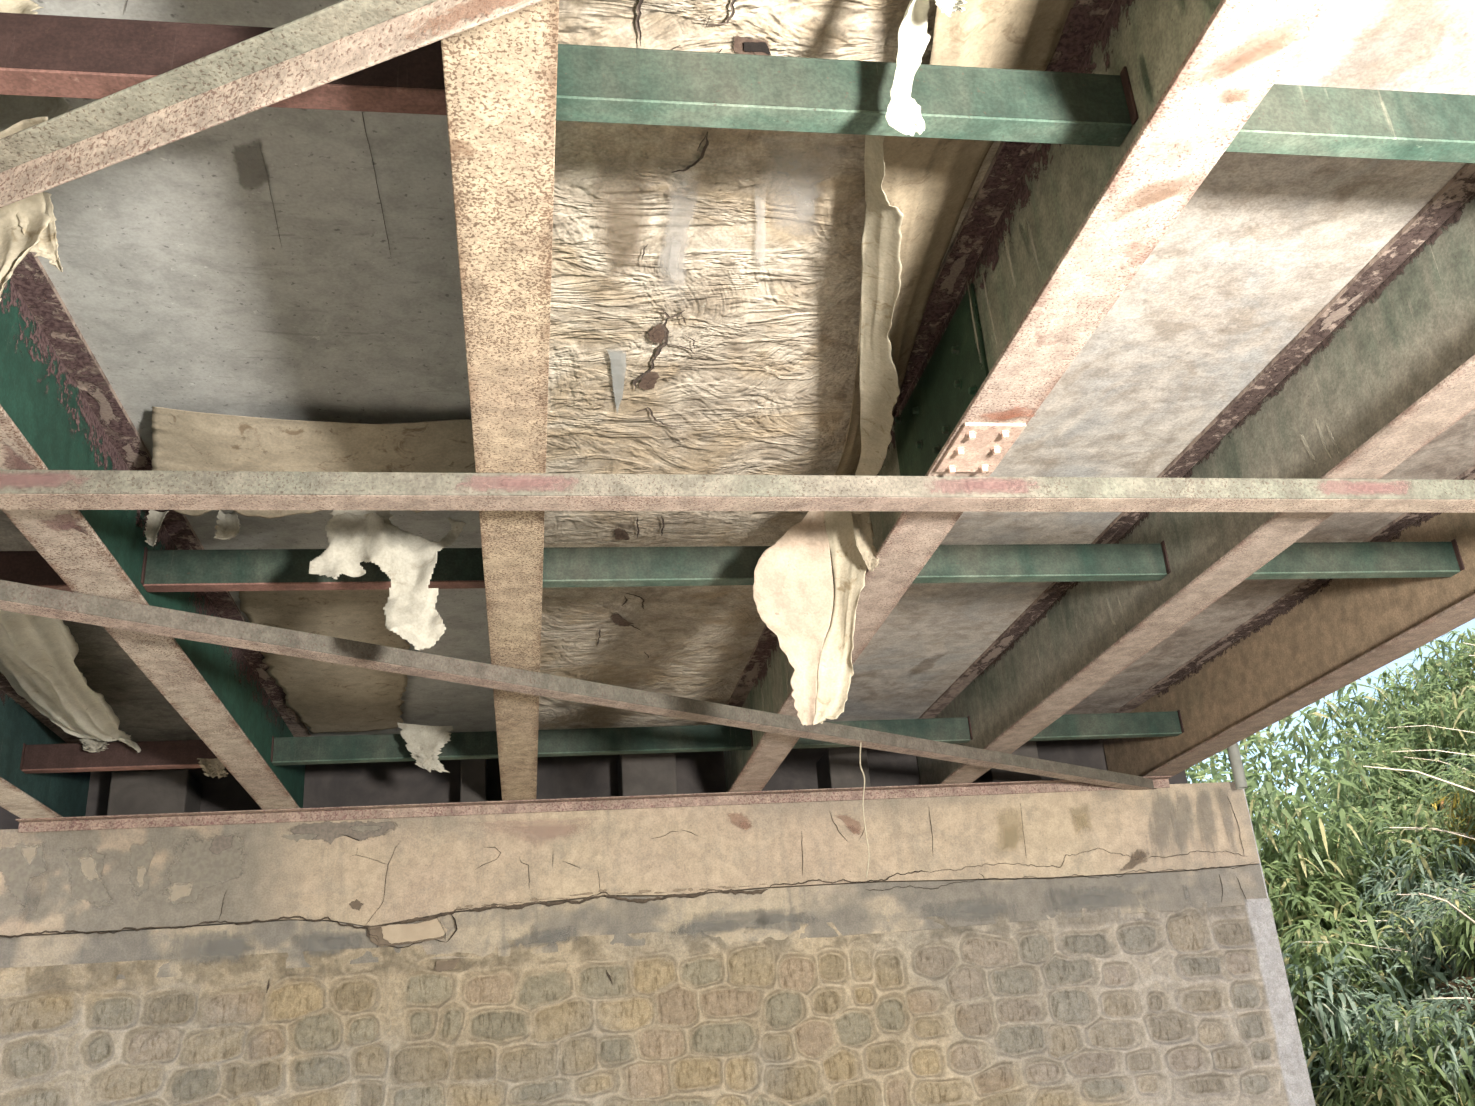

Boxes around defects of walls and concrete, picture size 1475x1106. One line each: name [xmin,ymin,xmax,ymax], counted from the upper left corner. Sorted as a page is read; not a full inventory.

crack [636,0,736,53]
crack [671,132,709,173]
corrosion [877,141,1061,476]
corrosion [1161,173,1475,478]
crack [633,310,696,428]
corrosion [1368,513,1441,542]
corrosion [1143,579,1332,697]
peeling [0,844,46,907]
peeling [62,848,112,908]
crack [0,797,1254,949]
spalling [369,913,457,947]
spalling [434,959,461,972]